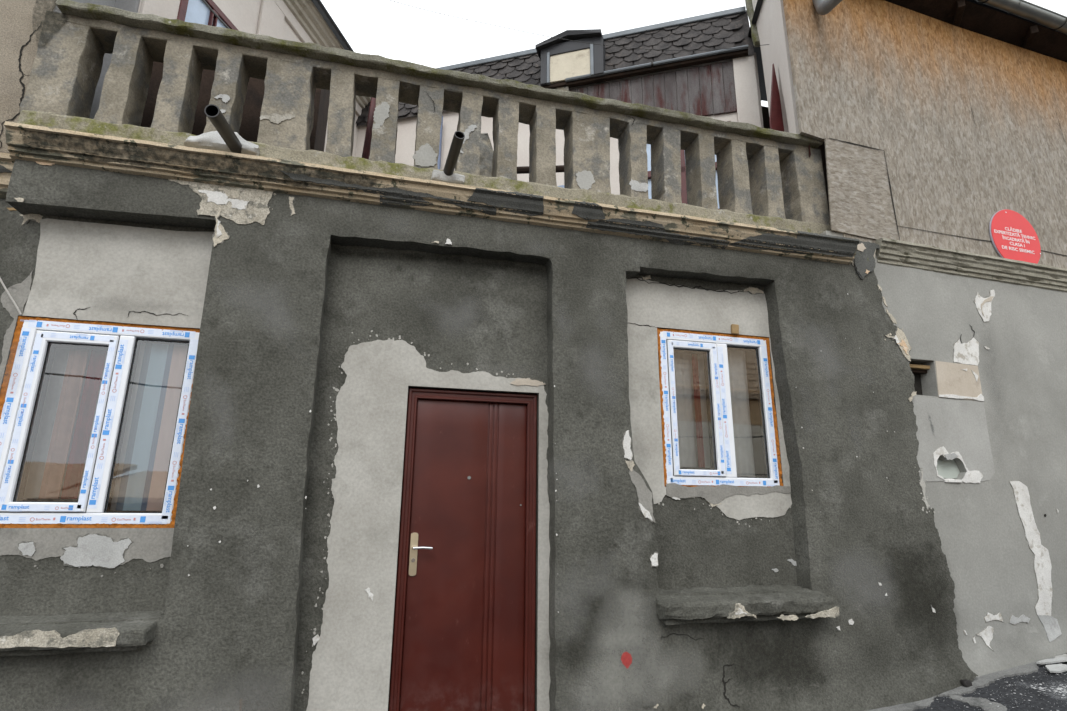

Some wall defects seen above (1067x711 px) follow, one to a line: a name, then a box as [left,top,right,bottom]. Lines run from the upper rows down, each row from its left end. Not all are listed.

crack [0,25,41,149]
flaking render [169,179,296,247]
peeling [953,289,995,382]
peeling [622,430,635,471]
spalling [915,446,983,513]
peeling [638,497,680,523]
peeling [18,541,38,569]
peeling [60,533,133,577]
peeling [963,480,1062,652]
flaking render [727,603,757,619]
flaking render [0,627,120,648]